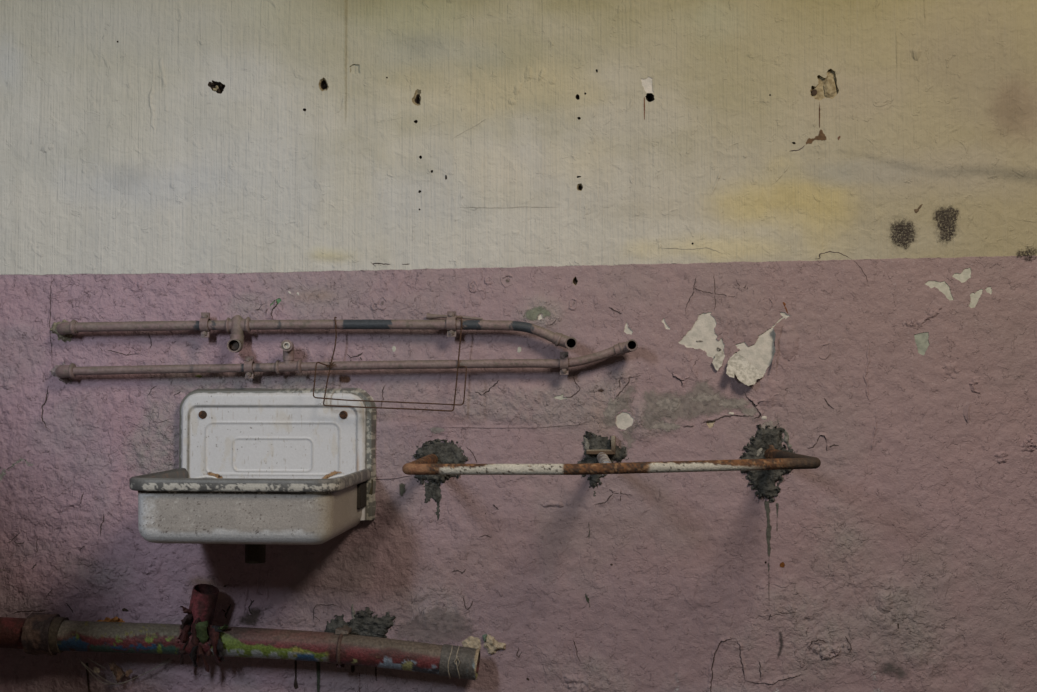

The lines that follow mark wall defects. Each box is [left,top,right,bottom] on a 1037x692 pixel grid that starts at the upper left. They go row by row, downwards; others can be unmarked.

spalling [810,69,839,128]
corrosion [789,130,840,152]
leakage [891,221,914,249]
leakage [935,207,959,241]
peeling [925,267,971,300]
peeling [969,286,992,308]
peeling [678,302,790,386]
flaking render [616,382,774,432]
crack [707,636,852,692]